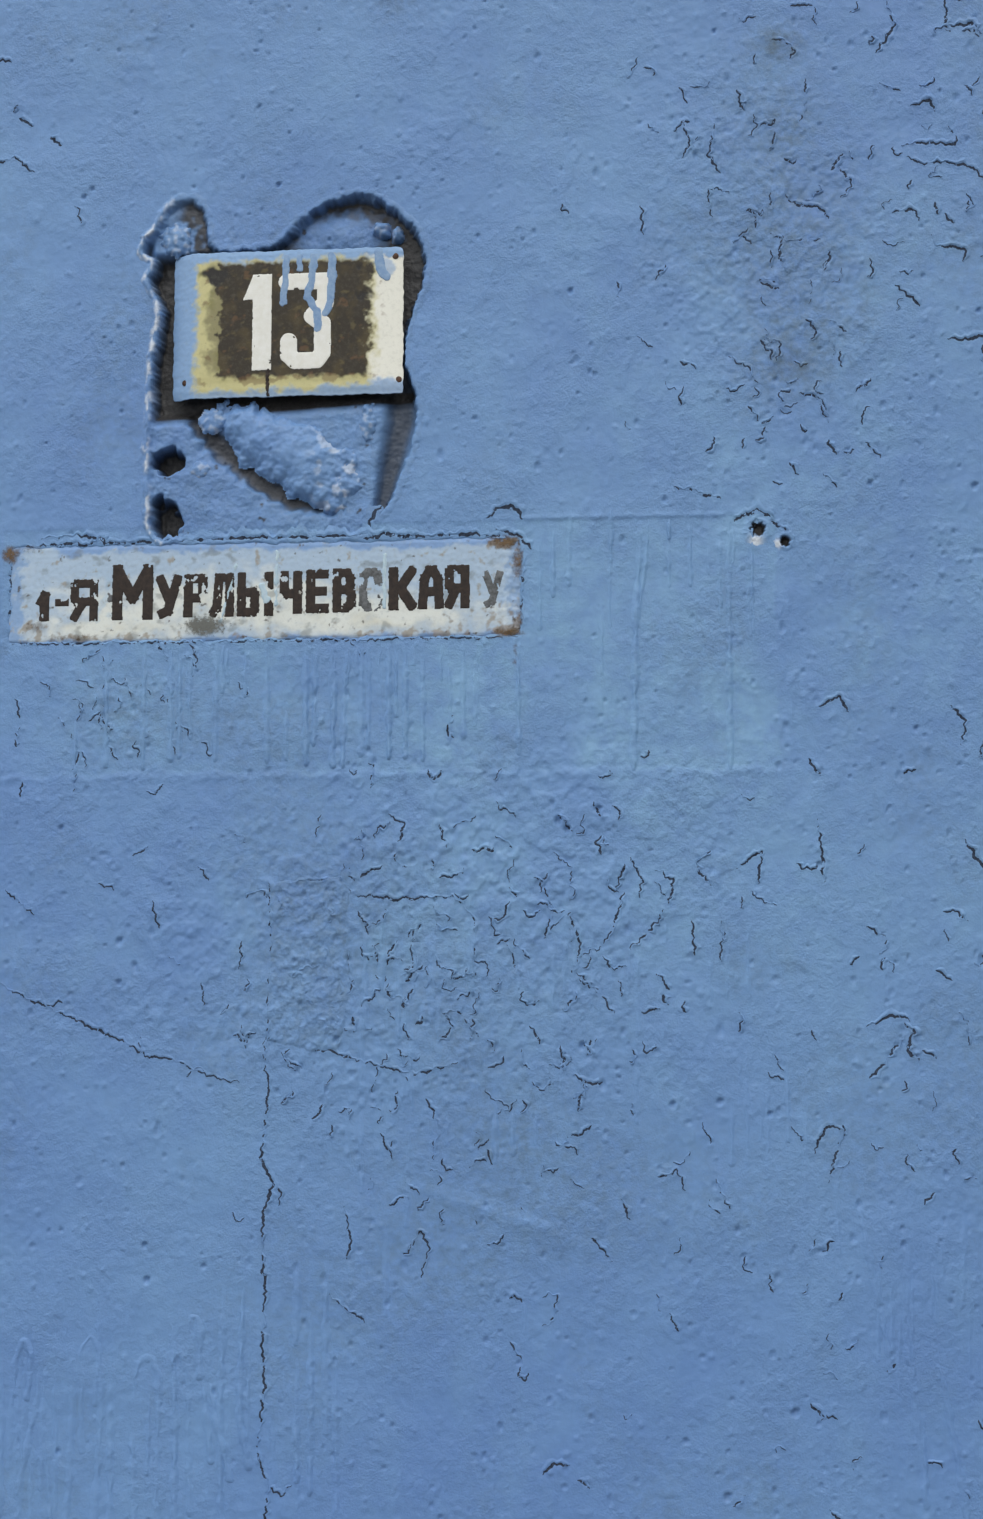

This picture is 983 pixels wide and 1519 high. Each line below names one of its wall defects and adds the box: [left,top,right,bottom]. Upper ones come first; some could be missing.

peeling [790,0,818,25]
peeling [867,0,899,54]
peeling [933,0,982,37]
peeling [647,82,730,217]
peeling [732,76,983,367]
peeling [726,328,883,458]
peeling [557,801,625,855]
peeling [233,813,712,1159]
peeling [689,920,729,961]
peeling [849,925,896,973]
crack [0,982,292,1519]
peeling [389,1098,493,1278]